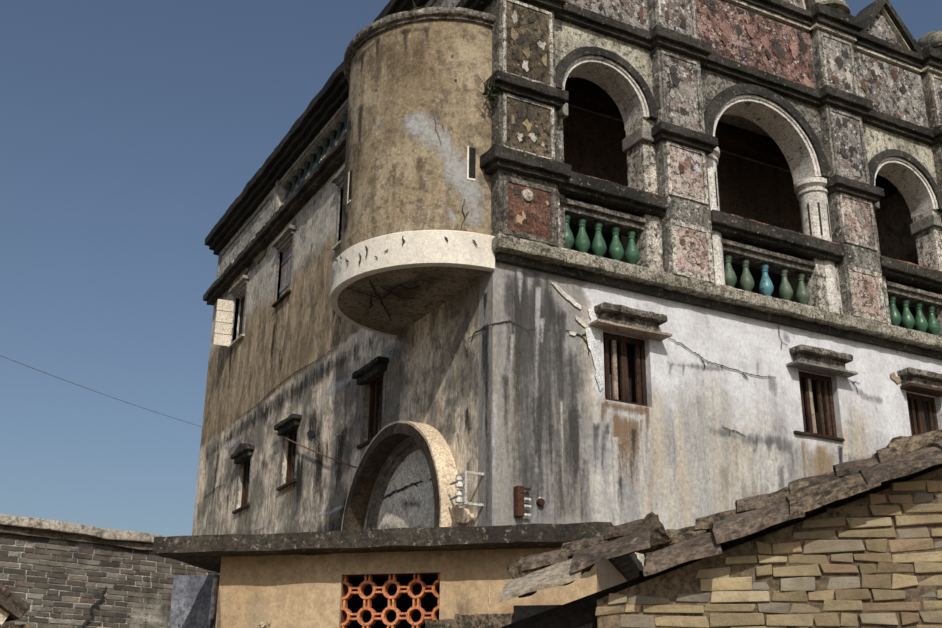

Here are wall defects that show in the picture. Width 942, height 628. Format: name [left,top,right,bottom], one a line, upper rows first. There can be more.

water stain [335,105,363,232]
water stain [207,344,362,503]
crack [464,320,519,359]
water stain [481,269,596,516]
crack [669,338,776,379]
water stain [293,408,347,532]
crack [382,478,432,499]
water stain [593,424,622,496]
water stain [742,434,794,488]
crack [81,586,107,628]